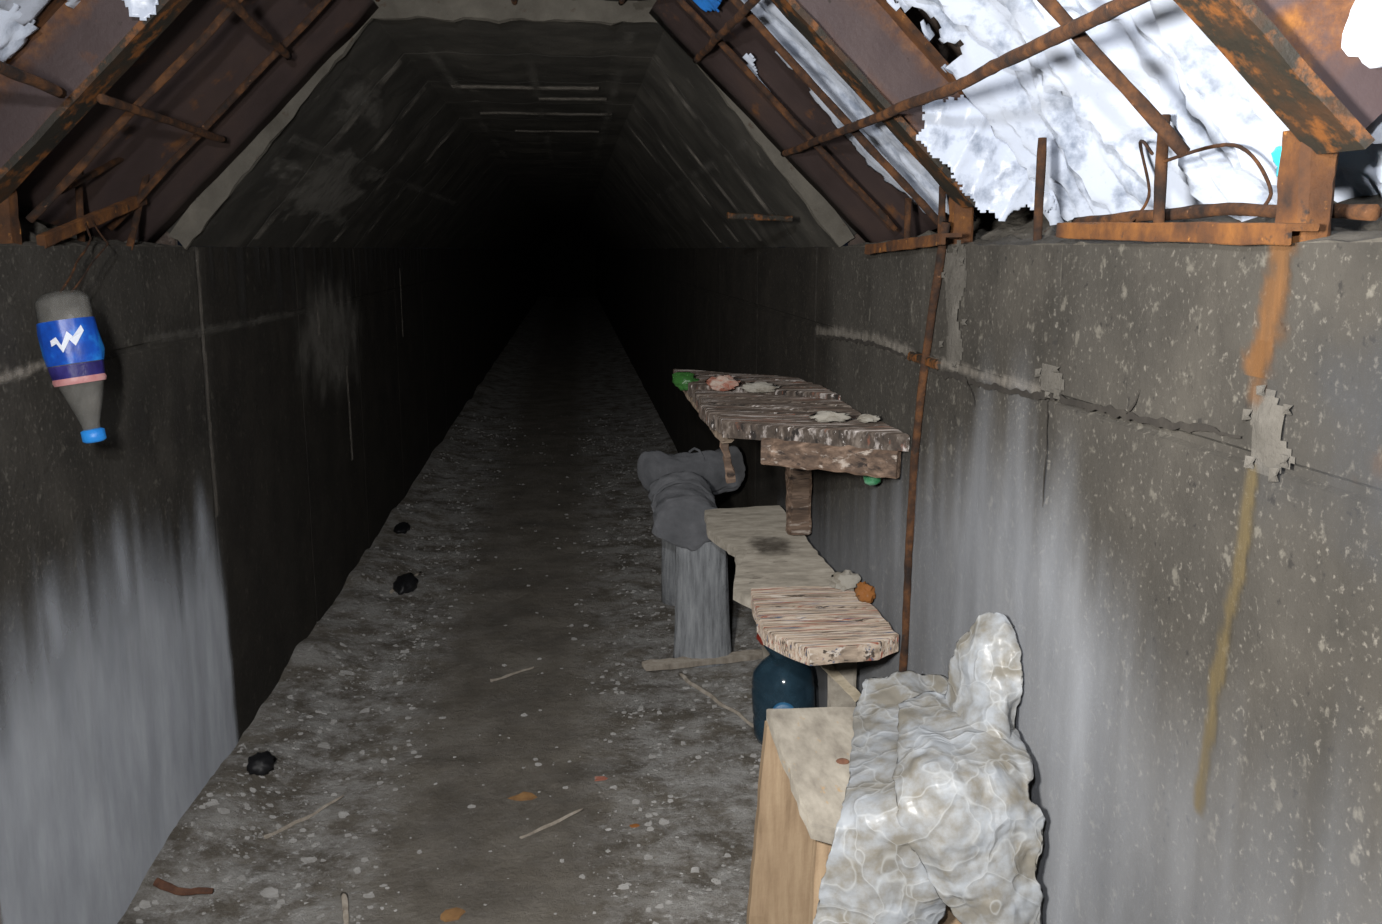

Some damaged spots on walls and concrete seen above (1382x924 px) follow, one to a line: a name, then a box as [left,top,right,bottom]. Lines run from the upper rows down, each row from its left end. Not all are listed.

damp [0,362,47,382]
damp [0,515,237,924]